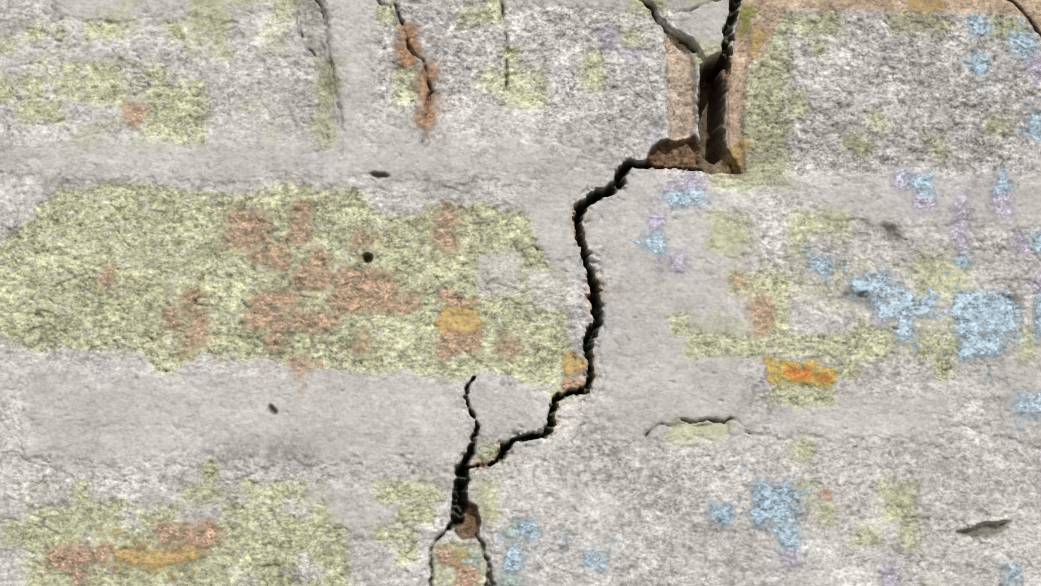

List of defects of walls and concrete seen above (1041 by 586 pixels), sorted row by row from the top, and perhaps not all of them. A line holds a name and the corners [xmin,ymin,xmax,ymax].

crack [290,0,345,159]
corrosion [395,24,440,129]
spalling [664,34,704,141]
spalling [726,0,1041,177]
crack [426,0,743,586]
crack [642,415,763,439]
spalling [0,460,352,586]